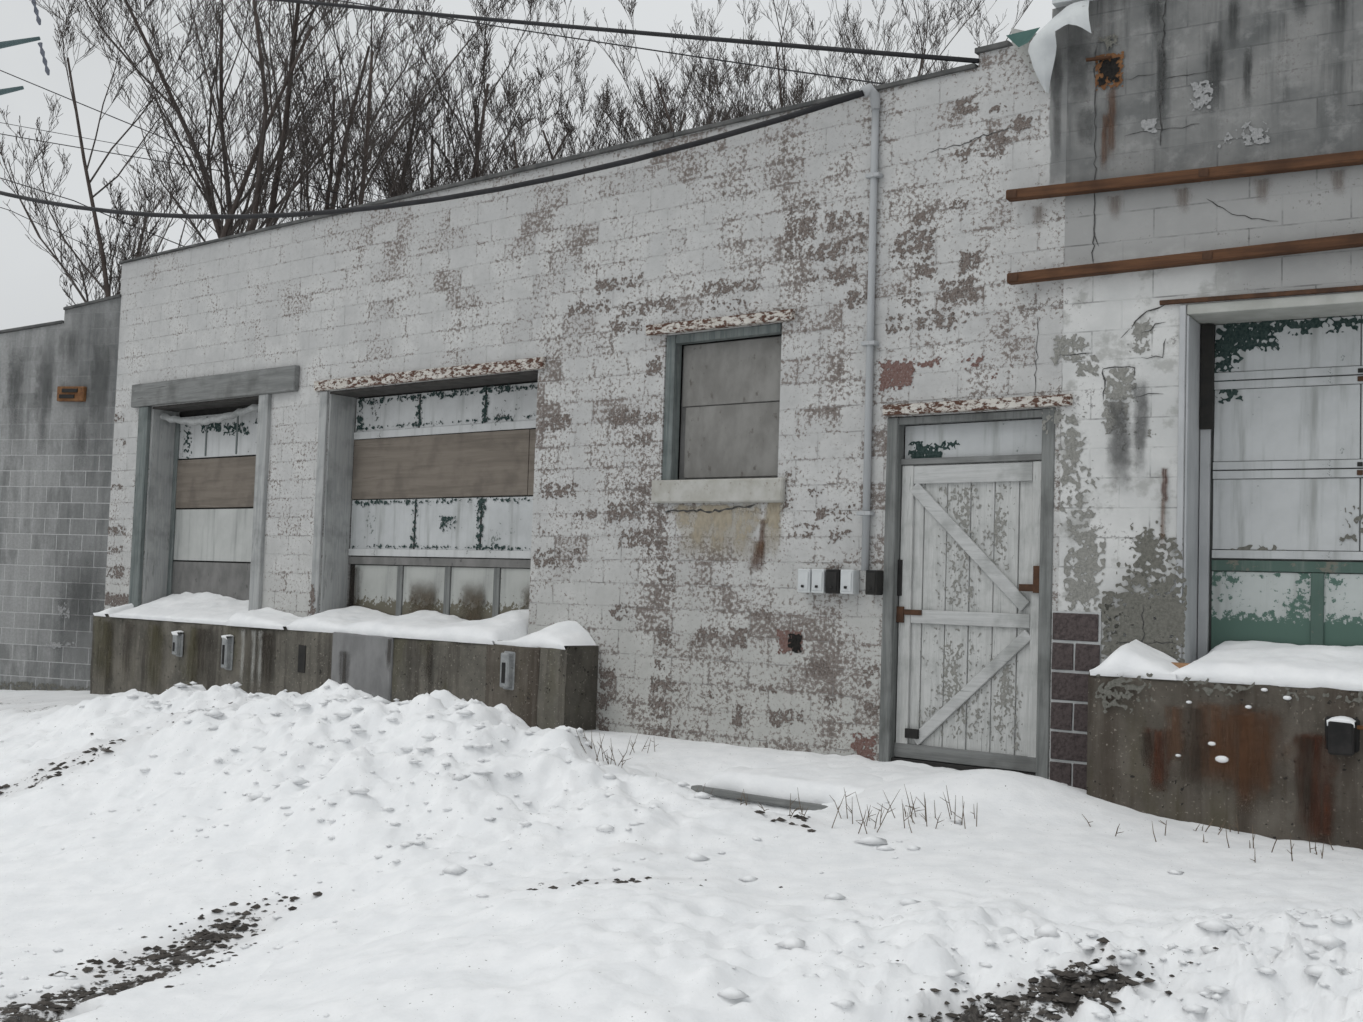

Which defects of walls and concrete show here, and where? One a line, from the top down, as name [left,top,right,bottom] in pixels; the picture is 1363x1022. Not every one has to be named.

water stain [1229,3,1237,32]
water stain [1054,48,1087,144]
peeling [565,272,677,350]
peeling [782,196,867,309]
peeling [885,199,981,335]
peeling [1214,315,1363,404]
peeling [908,440,960,459]
water stain [1110,389,1147,466]
peeling [351,480,677,595]
peeling [1041,318,1255,714]
corrosion [1194,705,1268,795]
corrosion [1295,734,1331,836]